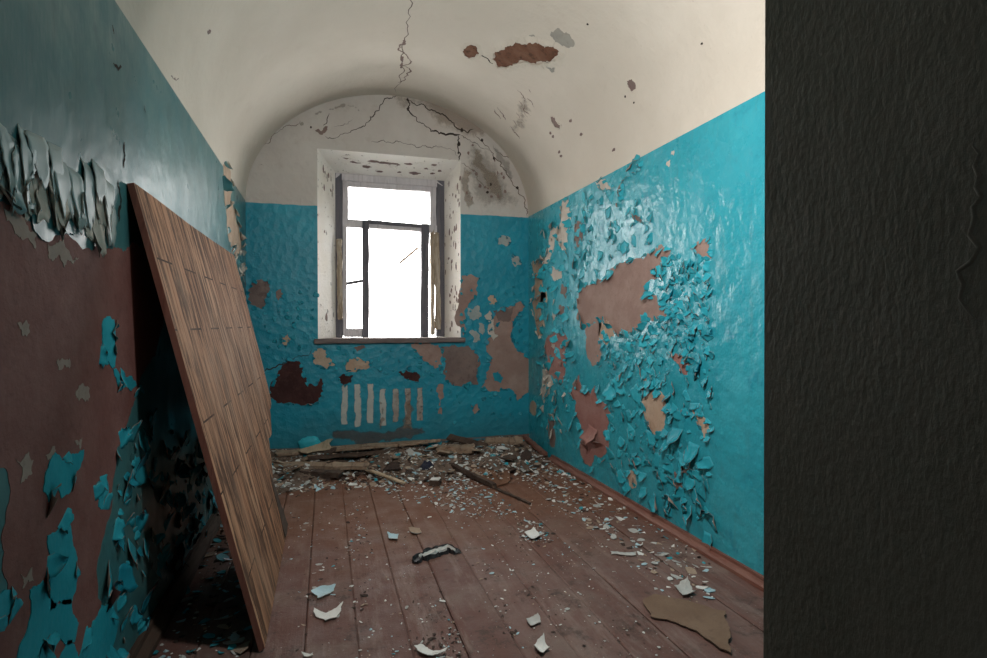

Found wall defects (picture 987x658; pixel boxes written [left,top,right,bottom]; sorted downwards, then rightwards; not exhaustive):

crack [323,0,528,215]
flaking render [460,28,575,73]
flaking render [549,115,572,138]
peeling [0,123,220,658]
peeling [222,154,717,551]